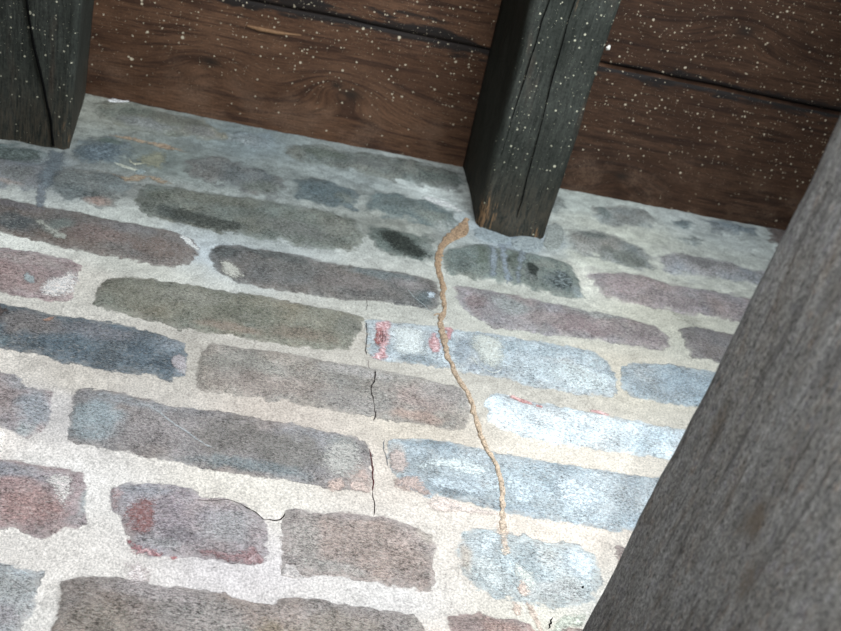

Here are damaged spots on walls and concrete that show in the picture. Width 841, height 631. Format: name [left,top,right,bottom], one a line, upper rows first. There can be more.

crack [365,297,376,421]
crack [369,439,388,514]